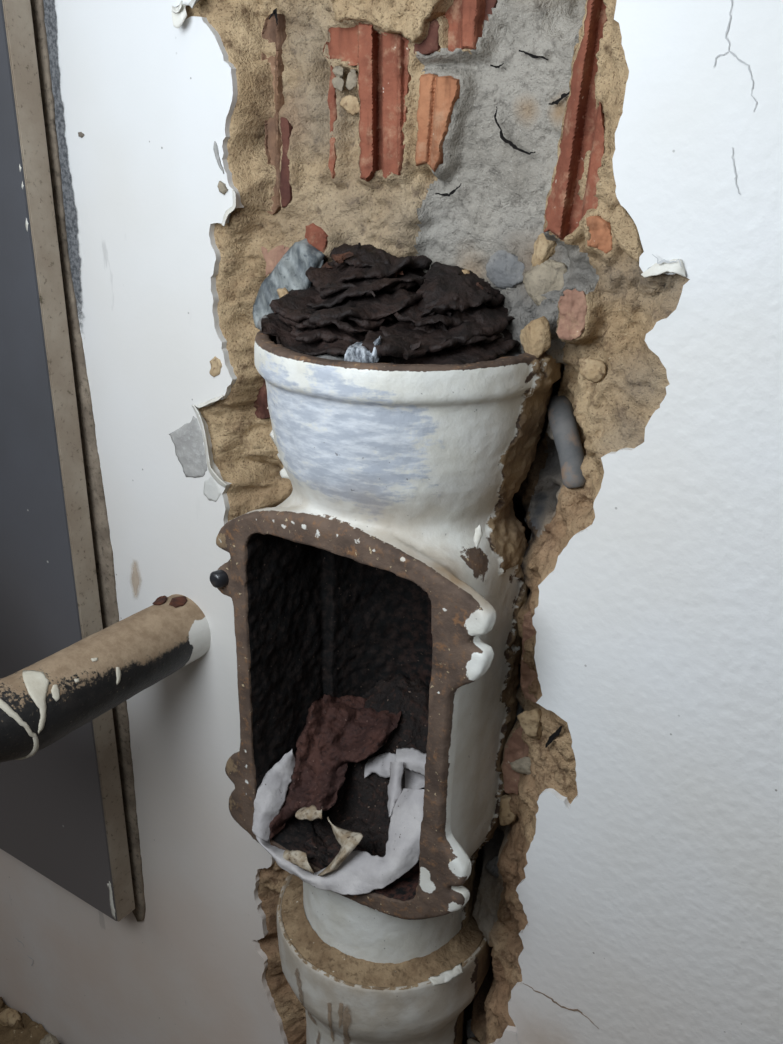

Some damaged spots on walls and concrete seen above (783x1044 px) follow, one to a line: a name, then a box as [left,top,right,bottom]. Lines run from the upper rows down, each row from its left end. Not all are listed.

crack [713,0,757,112]
crack [731,147,740,194]
spalling [169,0,690,1044]
spalling [152,596,187,608]
crack [523,983,599,1029]